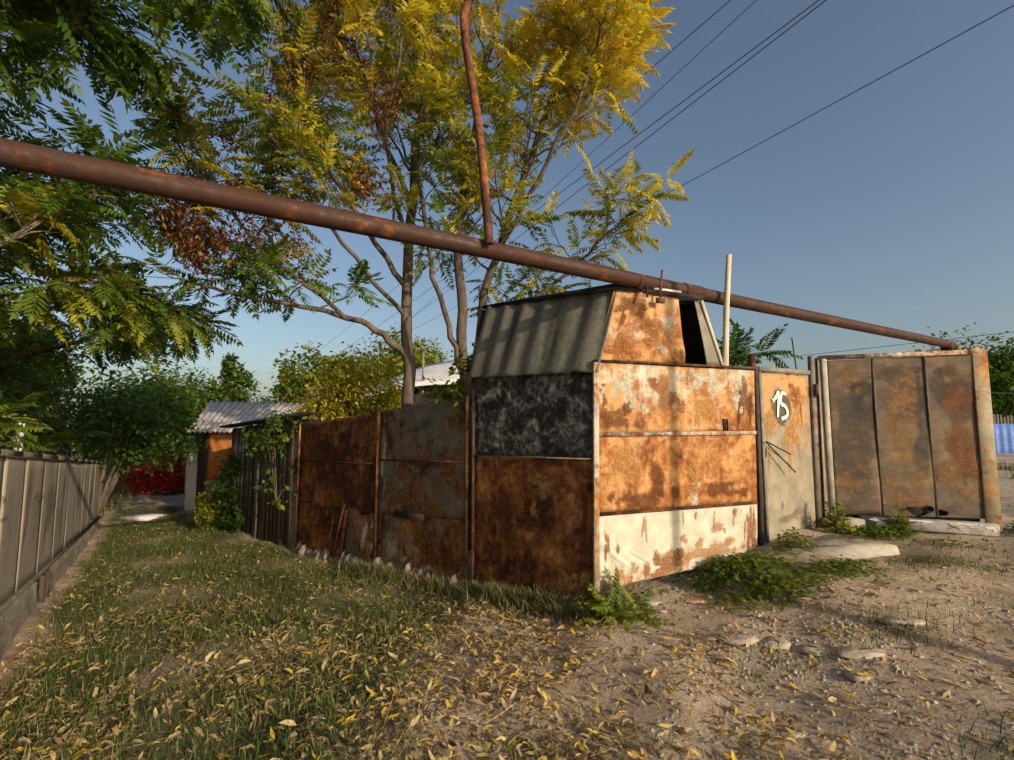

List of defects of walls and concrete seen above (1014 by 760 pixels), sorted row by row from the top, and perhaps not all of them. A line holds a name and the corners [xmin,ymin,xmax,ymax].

corrosion [604,297,668,359]
corrosion [599,383,645,429]
corrosion [648,375,716,425]
corrosion [736,376,754,429]
corrosion [764,384,803,472]
corrosion [608,463,679,540]
corrosion [688,459,748,497]
corrosion [604,532,620,561]
corrosion [644,507,757,579]